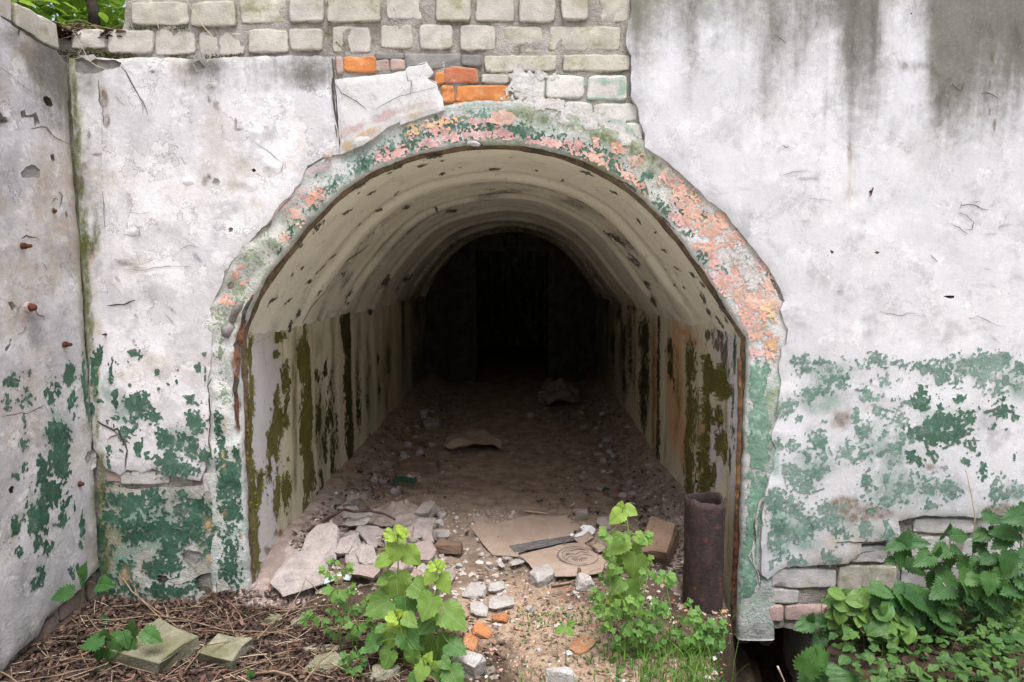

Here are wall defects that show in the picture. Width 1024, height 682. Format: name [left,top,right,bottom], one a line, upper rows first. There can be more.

crack [331,58,435,137]
spalling [21,165,41,178]
corrosion [231,330,244,376]
peeling [277,107,1024,622]
peeling [0,264,391,671]